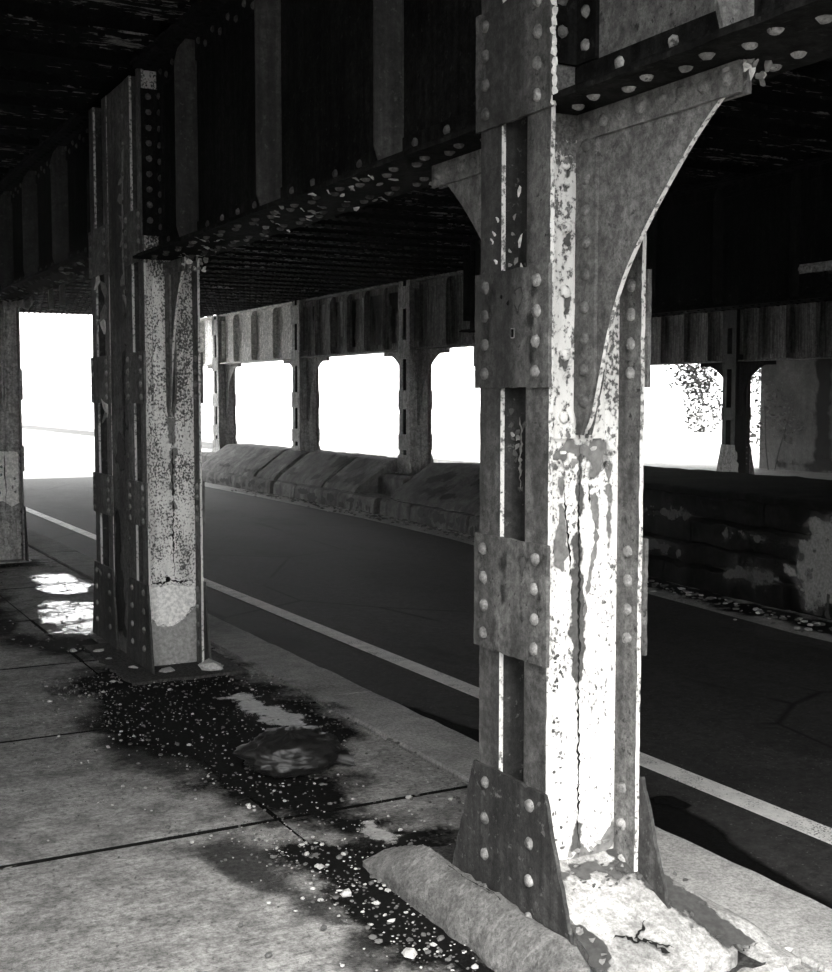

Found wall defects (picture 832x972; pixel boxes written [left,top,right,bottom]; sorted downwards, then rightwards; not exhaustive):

peeling [552,438,613,576]
damp [0,559,53,573]
spalling [720,514,832,620]
peeling [552,623,568,692]
damp [0,590,495,972]
peeling [552,717,564,785]
damp [649,796,832,909]
crack [614,920,674,954]